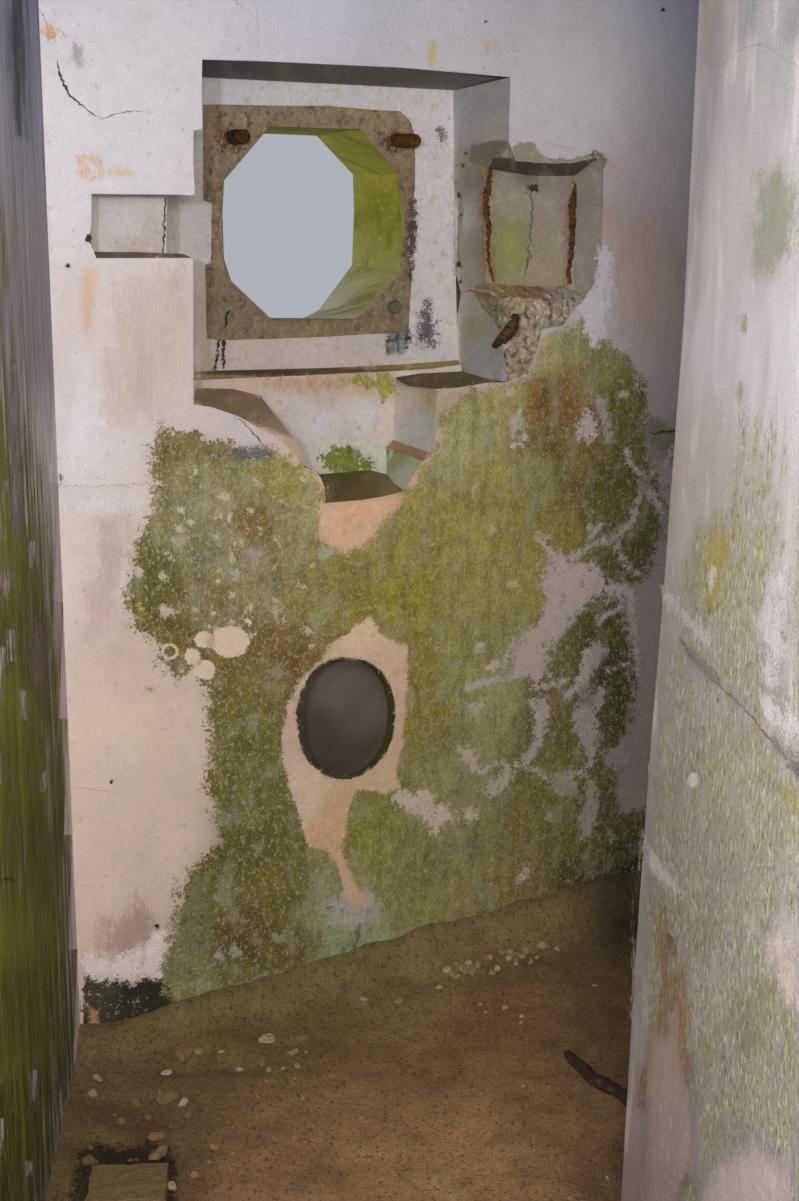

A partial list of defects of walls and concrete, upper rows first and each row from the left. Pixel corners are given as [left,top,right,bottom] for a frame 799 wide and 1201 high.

crack [57,62,139,119]
corrosion [475,162,505,285]
spalling [452,139,619,283]
damp [78,249,277,466]
mould [383,299,442,358]
damp [463,445,674,783]
damp [660,583,718,652]
damp [746,561,799,743]
efflorescence [386,784,481,840]
damp [642,837,688,898]
damp [745,914,799,1032]